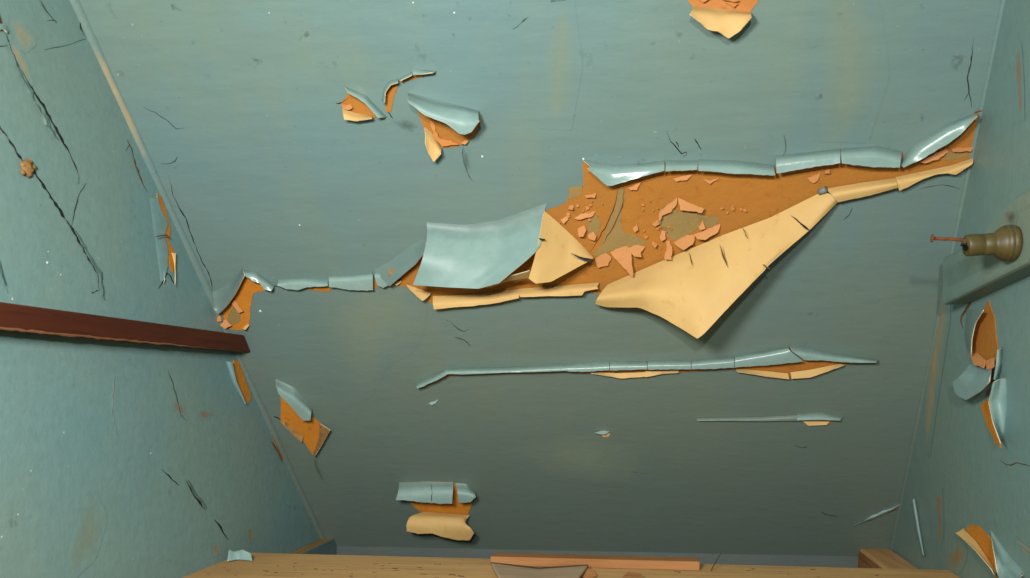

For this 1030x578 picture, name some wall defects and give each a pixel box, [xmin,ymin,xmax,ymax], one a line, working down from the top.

peeling [688,0,758,38]
peeling [336,67,481,162]
crack [0,32,105,300]
peeling [213,110,982,339]
peeling [226,360,252,404]
peeling [415,345,878,389]
peeling [953,300,1007,448]
peeling [275,379,330,484]
peeling [696,413,842,426]
peeling [396,481,476,540]
peeling [956,524,1024,578]